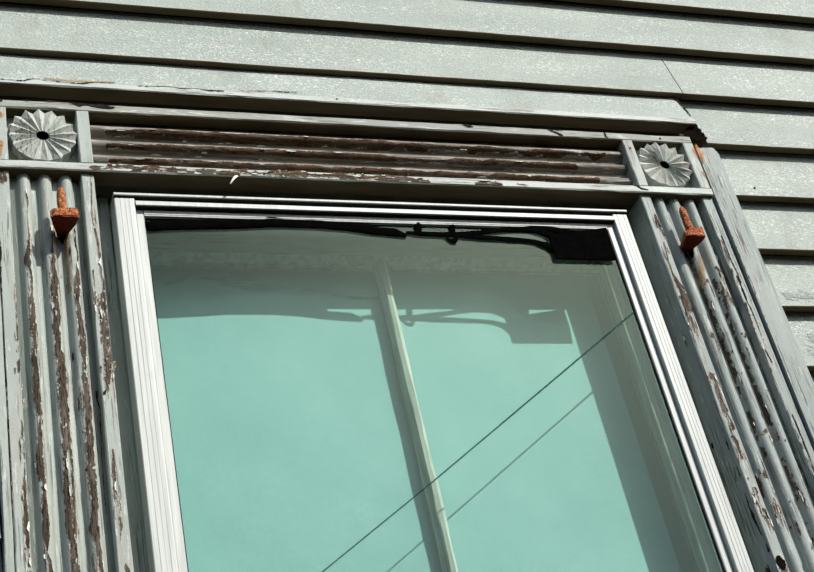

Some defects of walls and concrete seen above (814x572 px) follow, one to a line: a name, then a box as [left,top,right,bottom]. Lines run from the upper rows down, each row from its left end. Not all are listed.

peeling [90,128,606,186]
peeling [19,189,54,572]
peeling [49,223,104,572]
peeling [90,182,116,398]
peeling [112,449,123,541]
peeling [654,213,700,348]
peeling [685,237,814,551]
spalling [765,555,789,572]